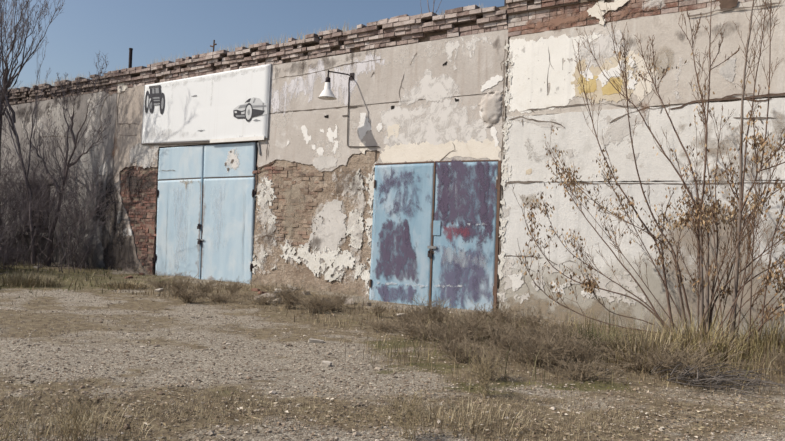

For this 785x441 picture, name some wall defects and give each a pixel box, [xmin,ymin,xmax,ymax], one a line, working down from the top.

spalling [117,143,159,275]
spalling [250,0,669,307]
crack [497,221,576,289]
crack [500,40,785,201]